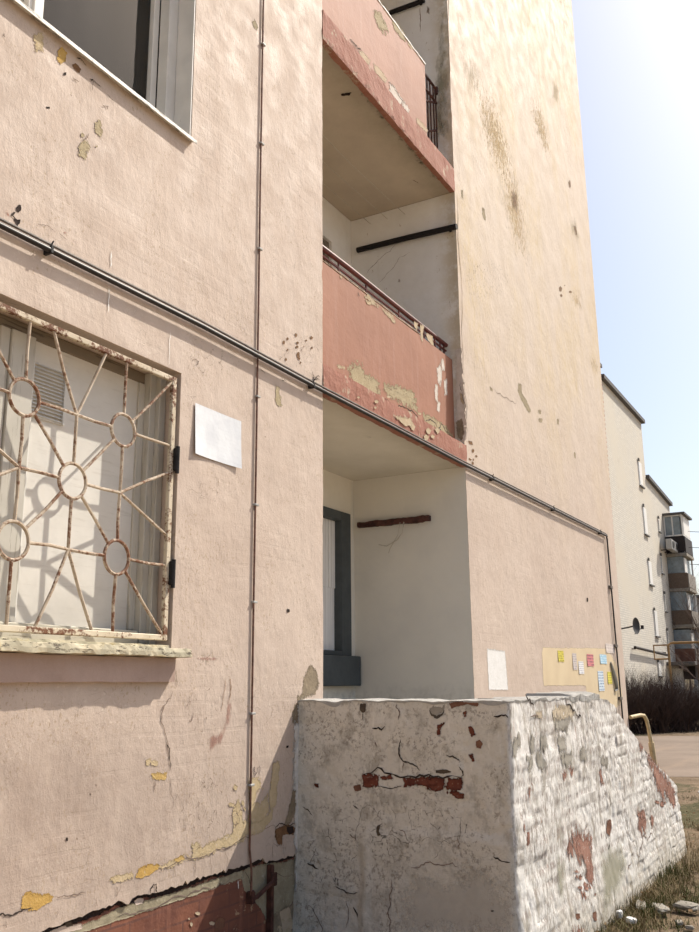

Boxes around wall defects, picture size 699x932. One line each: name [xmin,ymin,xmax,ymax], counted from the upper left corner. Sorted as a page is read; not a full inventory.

peeling [337,360,421,430]
flaking render [292,664,319,724]
crack [160,676,217,808]
crack [372,726,420,771]
flaking render [353,767,464,799]
flaking render [636,743,676,835]
crack [0,908,33,927]
peeling [21,890,53,911]
peeling [42,758,296,932]
crack [150,825,279,893]
crack [304,805,467,931]
flaking render [567,820,597,900]